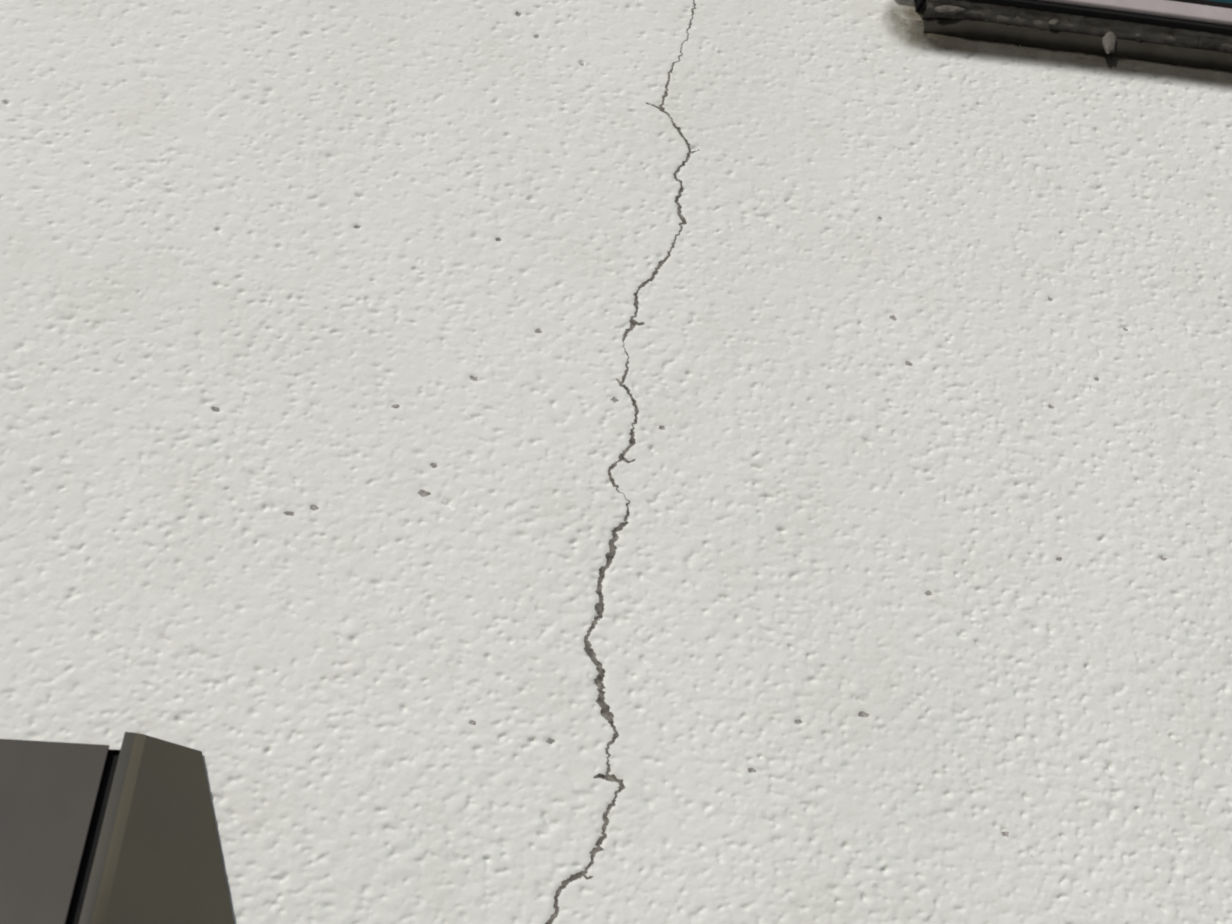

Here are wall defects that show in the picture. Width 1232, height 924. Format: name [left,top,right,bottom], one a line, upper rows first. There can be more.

crack [545,0,698,924]